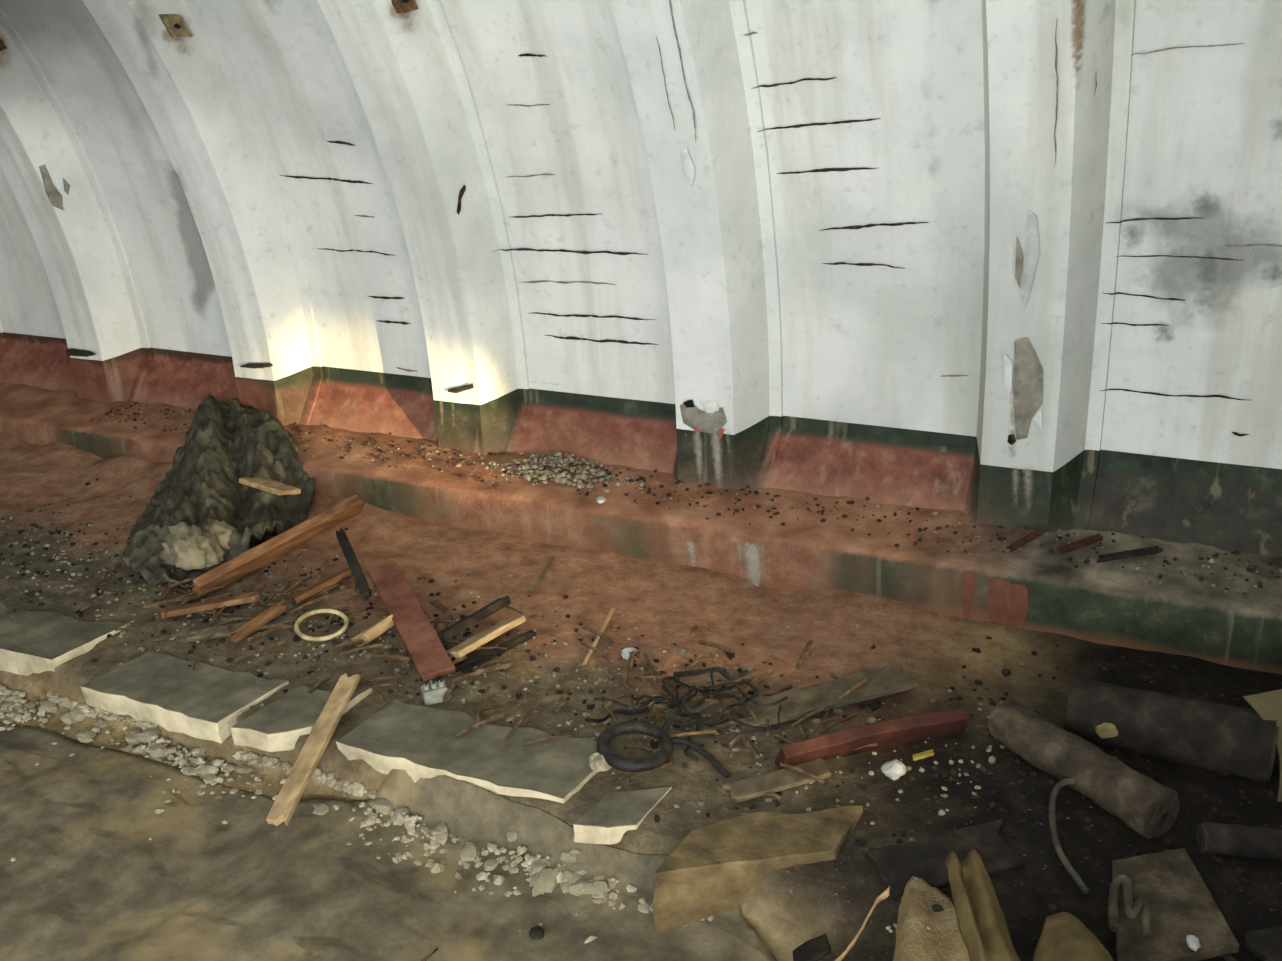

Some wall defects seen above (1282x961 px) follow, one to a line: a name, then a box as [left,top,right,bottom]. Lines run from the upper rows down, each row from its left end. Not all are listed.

corrosion [1073,0,1084,61]
crack [751,77,836,89]
crack [757,118,881,132]
peeling [39,164,70,211]
crack [279,175,372,184]
crack [778,166,876,174]
crack [819,222,929,231]
damp [1161,199,1282,292]
crack [493,214,658,345]
crack [1102,292,1186,326]
peeling [1004,337,1043,445]
flaking render [680,400,727,439]